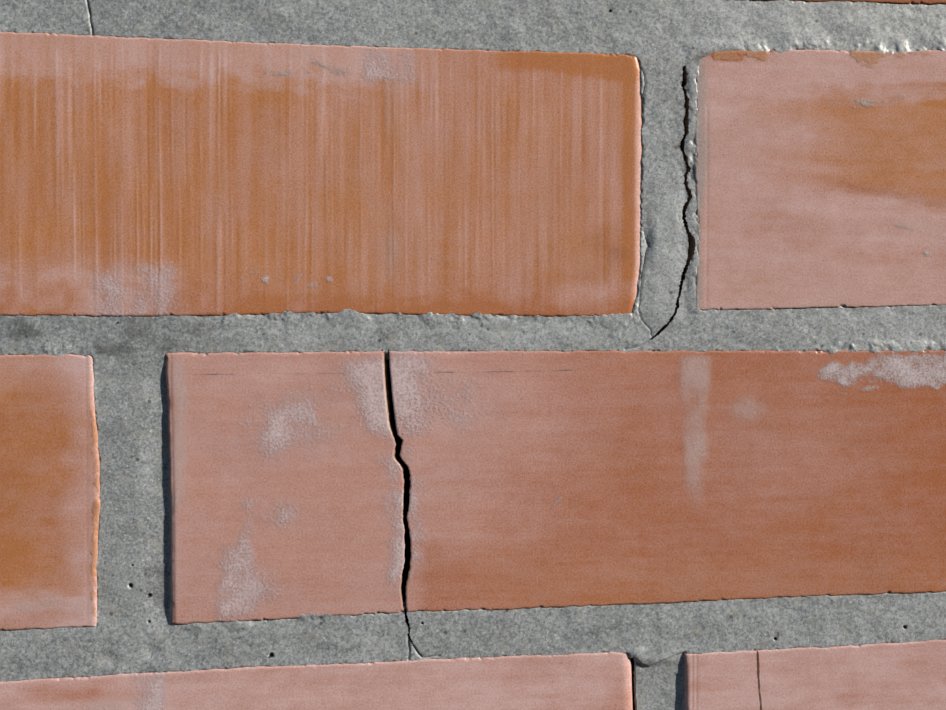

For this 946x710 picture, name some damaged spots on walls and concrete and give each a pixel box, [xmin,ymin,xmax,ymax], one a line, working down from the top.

crack [625,66,696,350]
crack [383,349,434,659]
efflorescence [820,354,946,391]